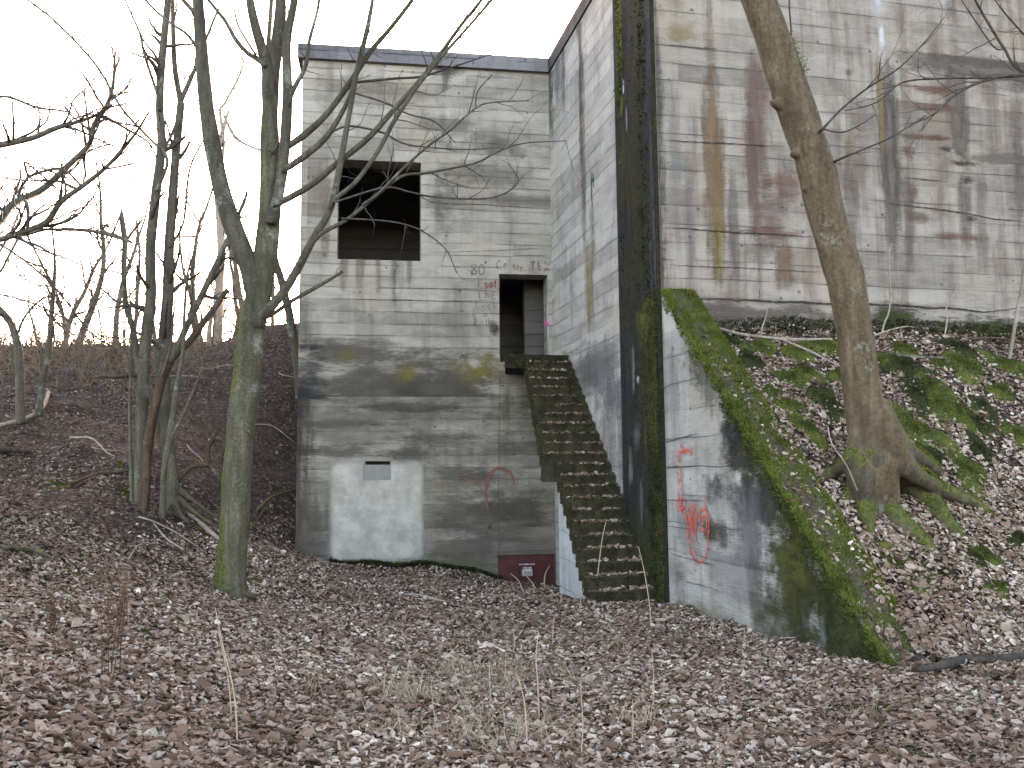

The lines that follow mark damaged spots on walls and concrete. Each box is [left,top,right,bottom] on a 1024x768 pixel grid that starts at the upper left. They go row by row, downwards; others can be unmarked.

corrosion [701,77,726,278]
corrosion [747,59,792,285]
water stain [296,342,492,485]
water stain [436,496,544,541]
water stain [704,415,775,571]